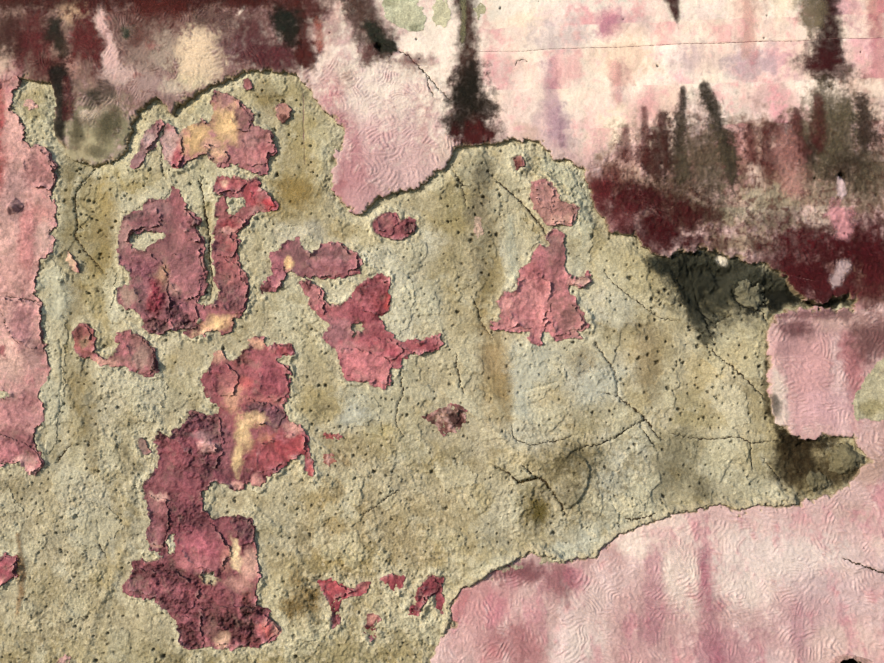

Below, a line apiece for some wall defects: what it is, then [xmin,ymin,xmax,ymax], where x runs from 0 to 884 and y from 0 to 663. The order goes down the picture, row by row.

water stain [0,0,332,140]
water stain [344,0,418,63]
water stain [443,0,497,145]
crack [74,167,104,273]
water stain [619,81,737,216]
water stain [646,0,884,345]
spalling [0,71,789,663]
crack [495,466,566,515]
crack [510,342,779,477]
spalling [696,279,817,338]
spalling [767,434,868,507]